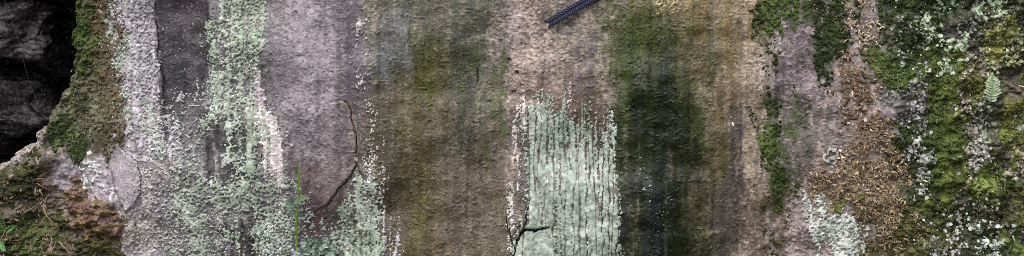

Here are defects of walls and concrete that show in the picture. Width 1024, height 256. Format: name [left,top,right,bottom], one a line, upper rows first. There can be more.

crack [325,100,362,220]
leakage [538,0,786,256]
crack [505,206,549,256]